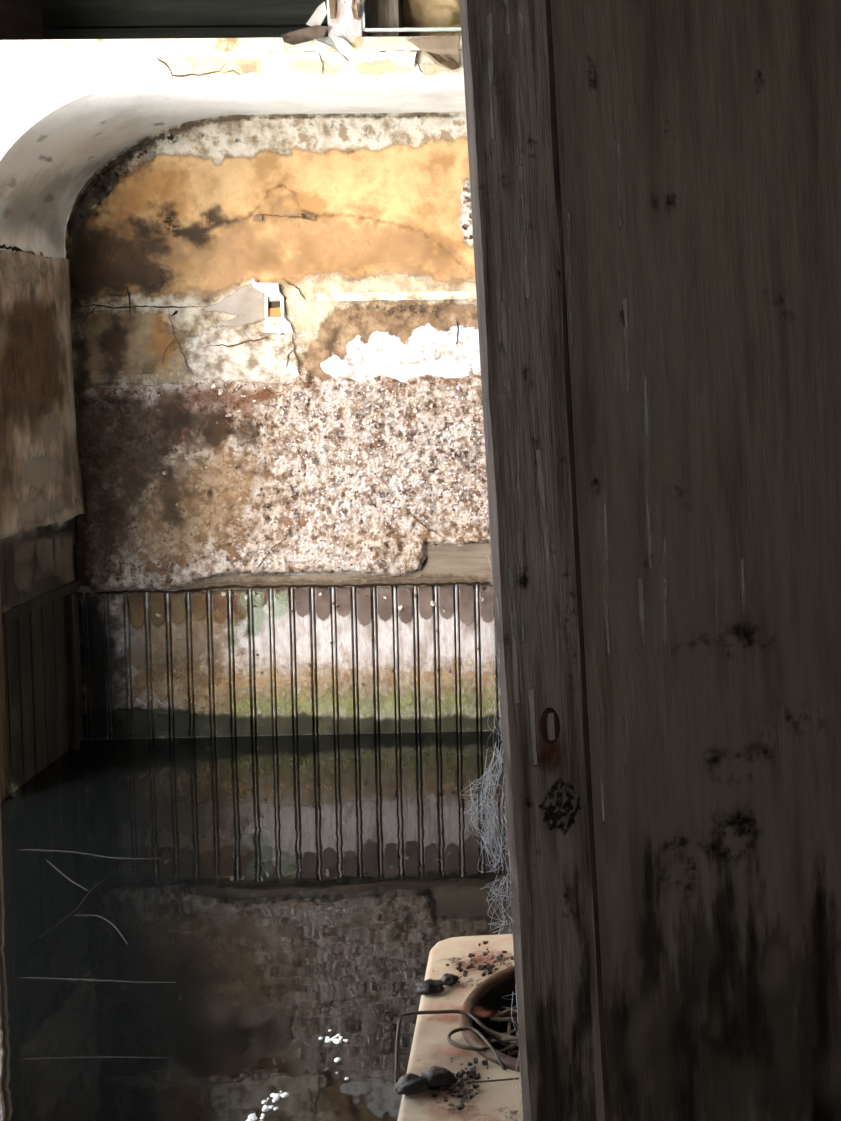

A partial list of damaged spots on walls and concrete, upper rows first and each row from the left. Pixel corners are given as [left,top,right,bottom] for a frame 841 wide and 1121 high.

peeling [168,54,262,77]
peeling [281,0,460,76]
leakage [0,200,501,739]
spalling [76,136,494,633]